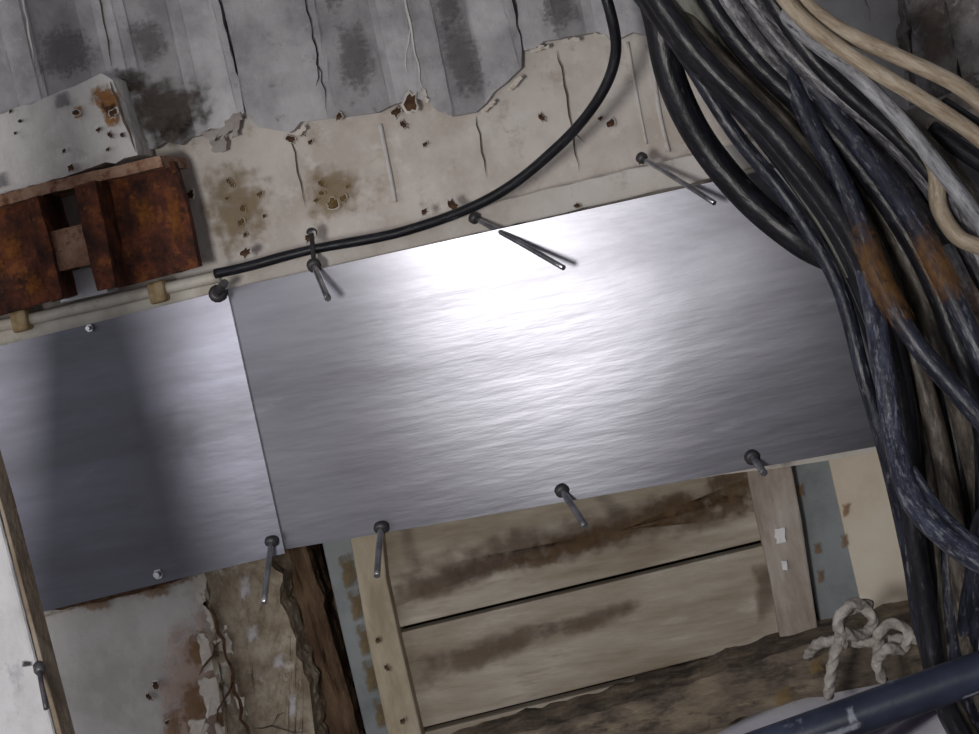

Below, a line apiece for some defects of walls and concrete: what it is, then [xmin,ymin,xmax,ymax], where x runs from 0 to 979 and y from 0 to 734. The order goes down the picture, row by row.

rust [56,94,82,118]
rust [92,86,120,126]
damp [114,70,210,148]
peeling [188,573,248,734]
spalling [145,680,160,701]